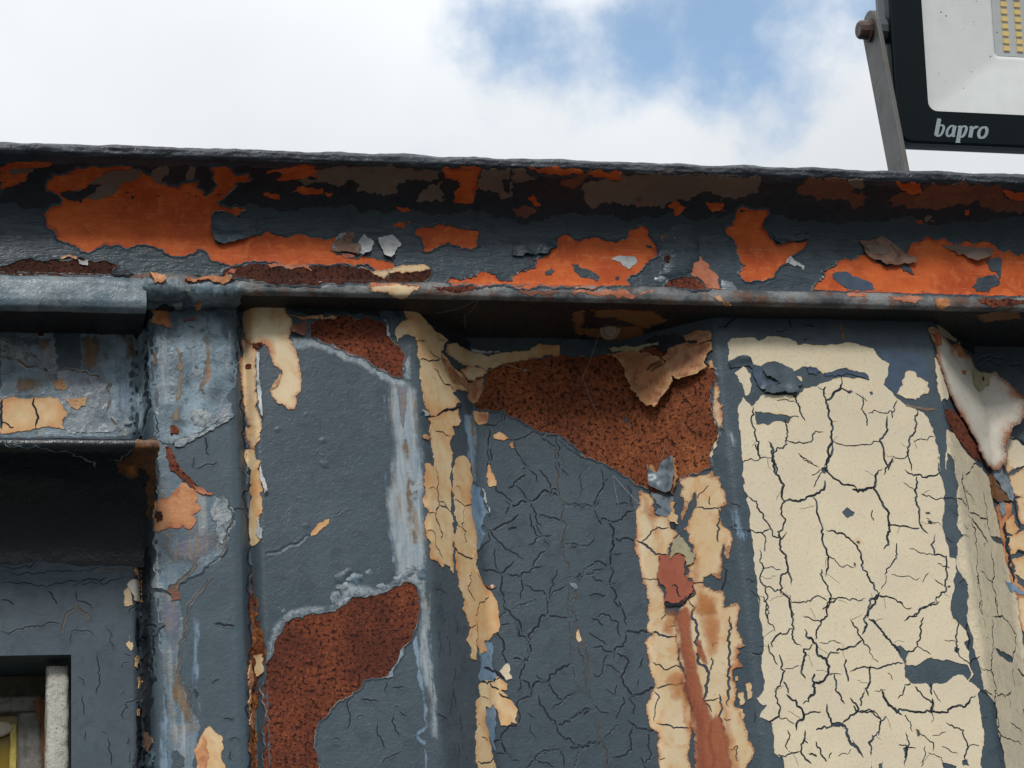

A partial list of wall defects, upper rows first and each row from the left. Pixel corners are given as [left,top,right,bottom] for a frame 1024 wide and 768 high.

rust [0,254,134,278]
rust [247,569,423,768]
rust [287,313,409,386]
rust [219,262,484,293]
peeling [0,161,815,768]
crack [434,410,660,768]
rust [471,309,722,494]
rust [666,596,731,768]
peeling [634,325,1024,768]
crack [718,376,1022,767]
rust [889,295,951,311]